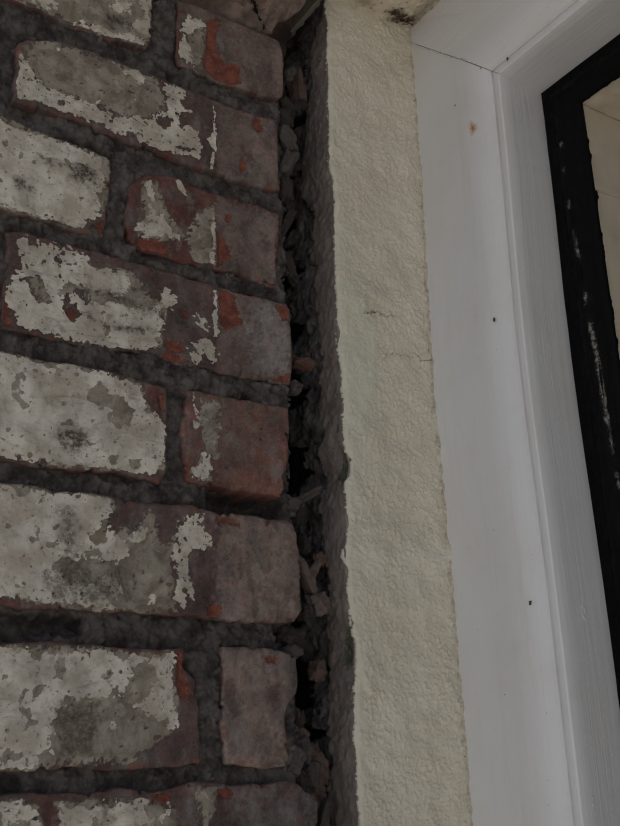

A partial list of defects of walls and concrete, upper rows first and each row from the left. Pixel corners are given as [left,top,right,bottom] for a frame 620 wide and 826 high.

crack [251,0,266,30]
leakage [385,9,413,26]
peeling [16,41,217,169]
peeling [0,116,110,235]
crack [277,65,308,285]
peeling [3,235,243,365]
peeling [0,351,167,476]
crack [287,357,318,397]
peeling [0,483,212,614]
crack [274,485,332,683]
peeling [0,644,192,772]
crack [287,710,332,826]